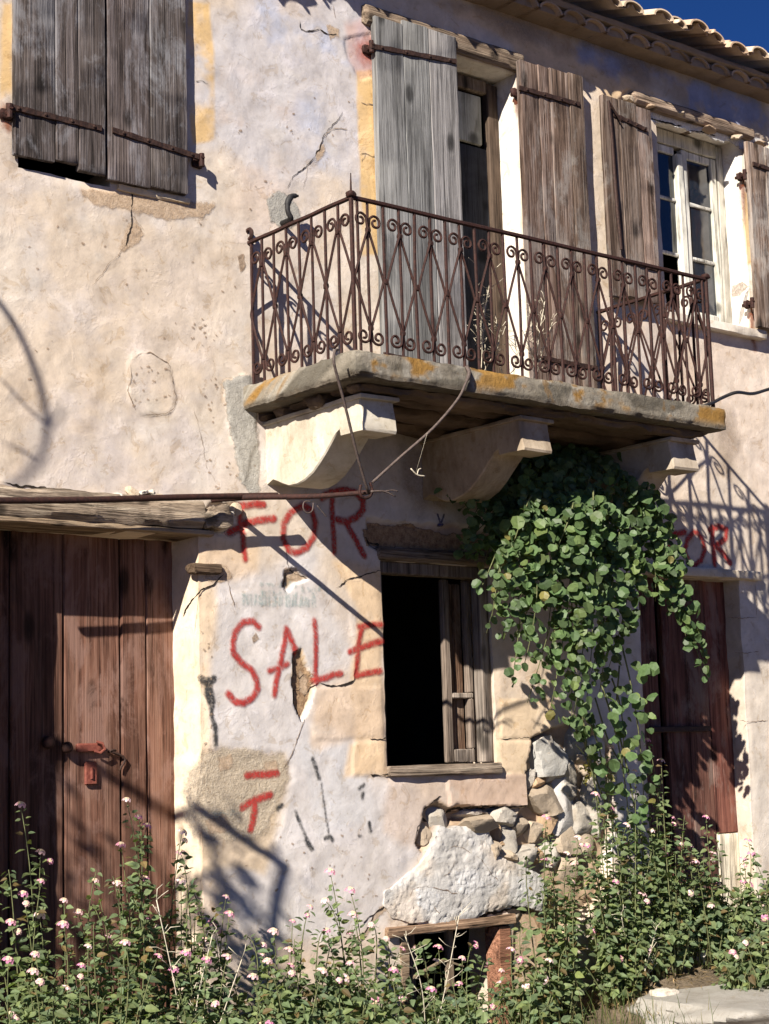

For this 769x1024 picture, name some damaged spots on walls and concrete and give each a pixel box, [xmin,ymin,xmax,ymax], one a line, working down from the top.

crack [300,7,339,39]
crack [288,115,344,187]
crack [95,194,144,283]
crack [339,542,380,587]
crack [183,566,234,617]
peeling [292,662,307,712]
peeling [205,814,231,834]